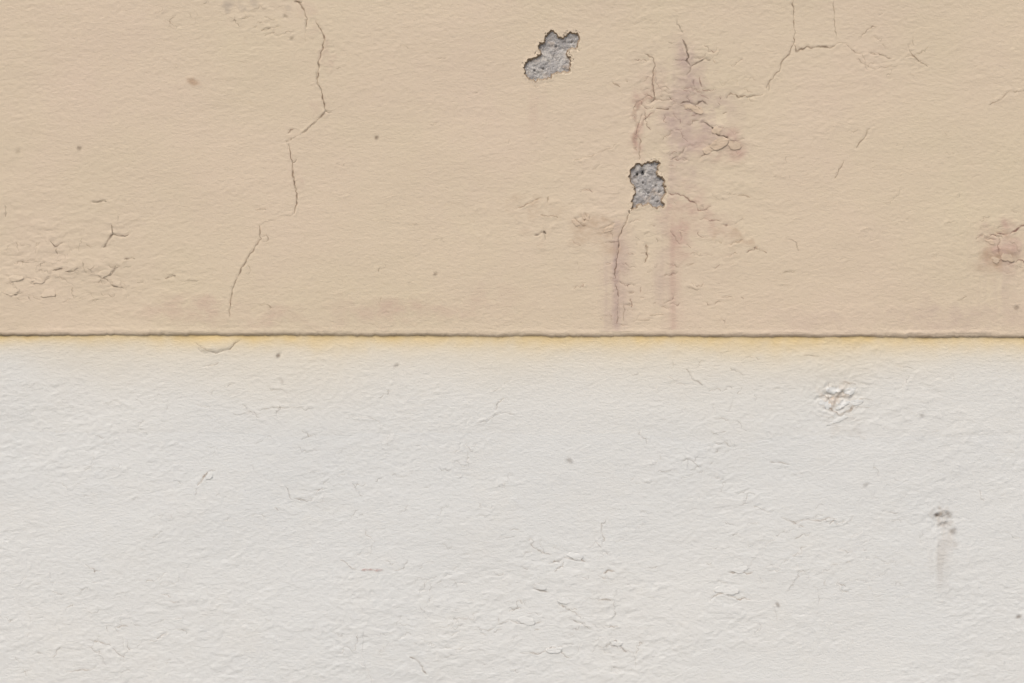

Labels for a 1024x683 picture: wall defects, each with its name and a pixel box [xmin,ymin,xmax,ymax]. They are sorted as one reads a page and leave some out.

damp [281,1,338,119]
spalling [520,26,583,84]
crack [633,39,728,156]
damp [0,23,1024,444]
spalling [625,158,670,214]
spalling [814,381,867,440]